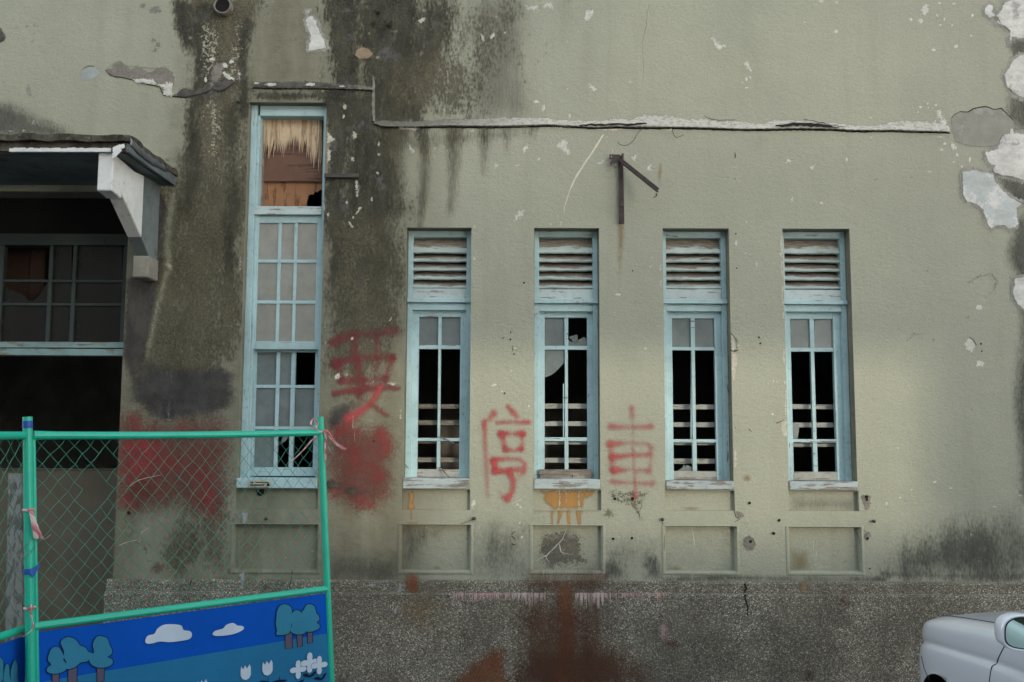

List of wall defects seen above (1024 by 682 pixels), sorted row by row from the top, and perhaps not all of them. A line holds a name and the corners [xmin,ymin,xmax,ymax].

spalling [79,57,240,102]
peeling [295,7,331,54]
peeling [971,0,1024,103]
damp [124,0,515,404]
crack [252,76,1013,226]
peeling [917,103,1024,233]
crack [742,583,750,616]